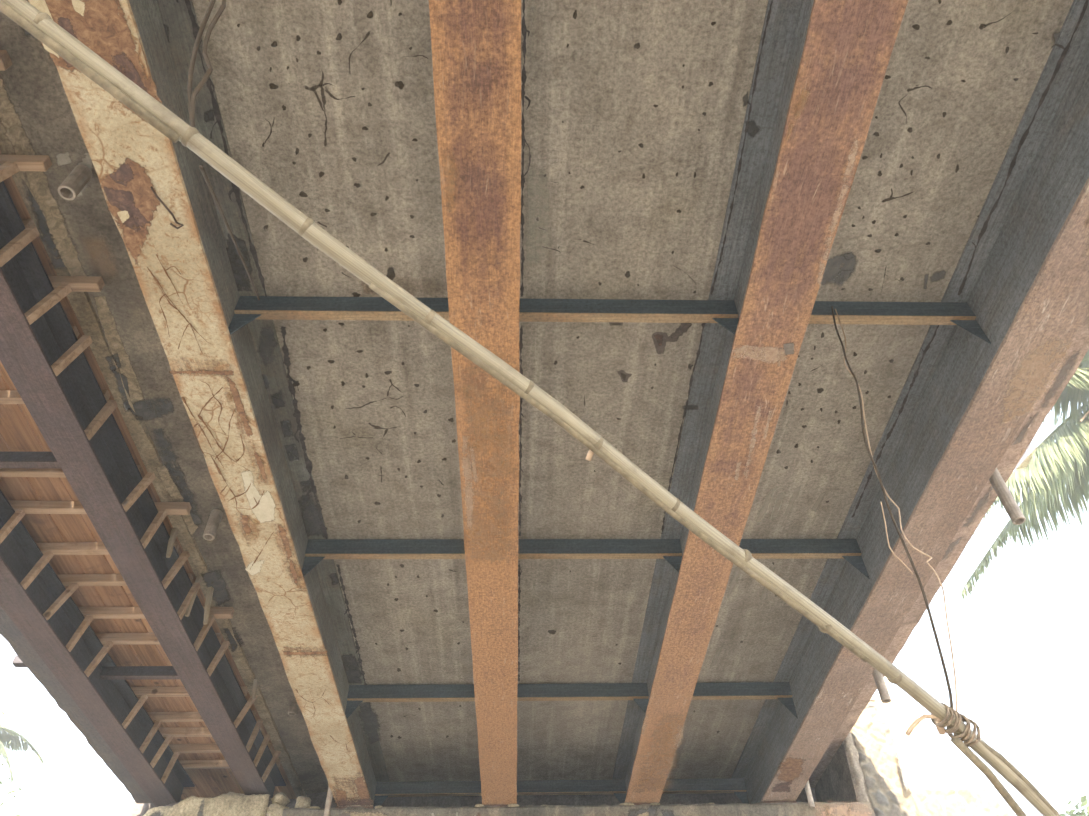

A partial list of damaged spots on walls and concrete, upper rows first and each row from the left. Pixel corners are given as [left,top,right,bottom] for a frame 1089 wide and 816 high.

peeling [28,0,162,104]
peeling [101,158,160,265]
crack [147,254,206,352]
damp [820,252,857,285]
crack [182,381,264,509]
rust [772,757,806,792]